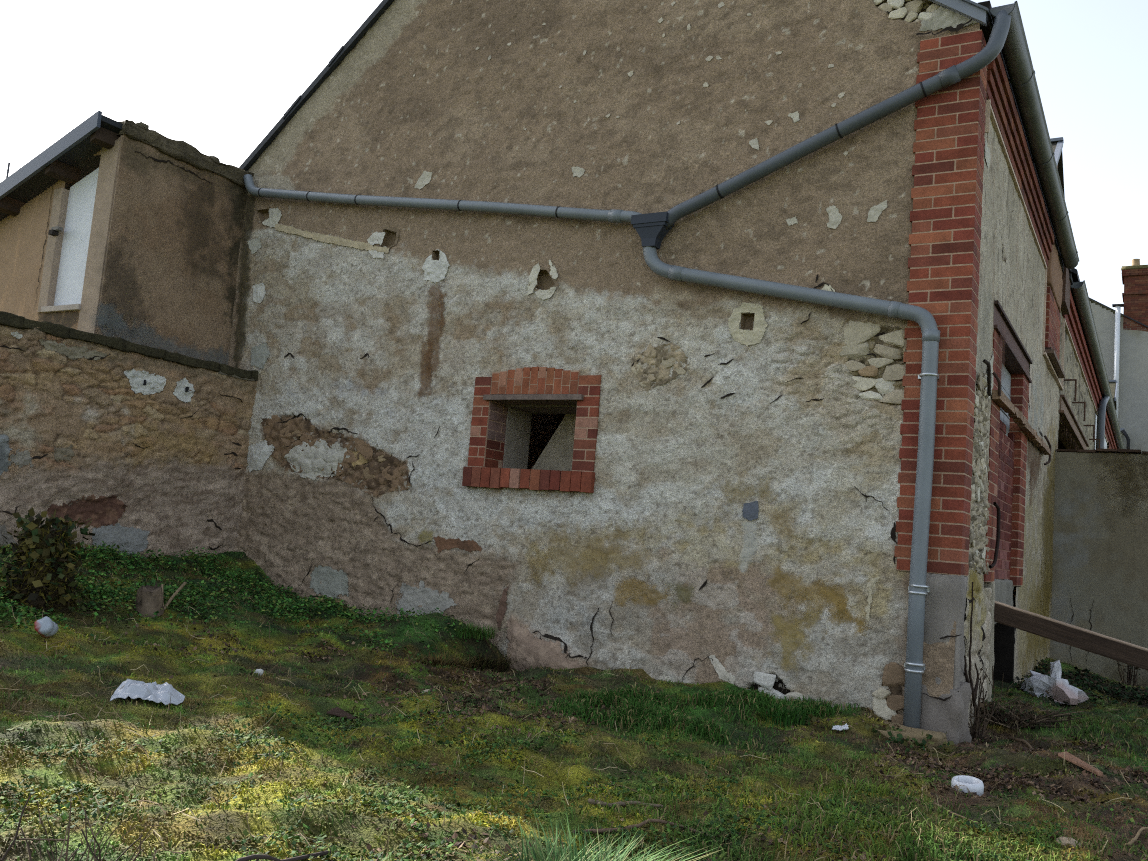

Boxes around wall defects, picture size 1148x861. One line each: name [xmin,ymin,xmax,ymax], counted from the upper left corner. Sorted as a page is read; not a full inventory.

spalling [873,0,940,22]
damp [97,196,255,368]
spalling [367,227,399,258]
spalling [422,249,450,283]
spalling [526,260,559,300]
spalling [839,320,907,405]
spalling [247,415,412,496]
spalling [47,494,128,528]
crack [371,497,434,547]
damp [1030,453,1055,616]
damp [770,569,862,624]
crack [533,600,614,665]